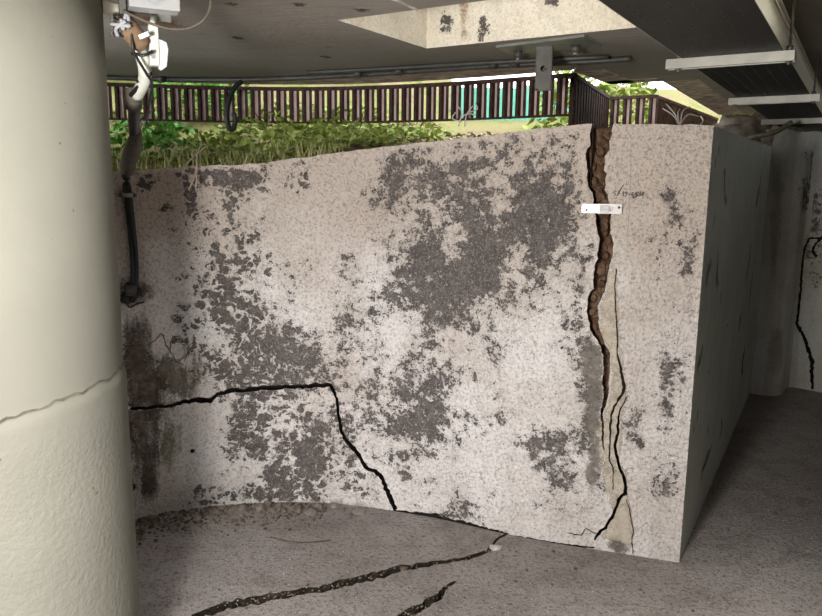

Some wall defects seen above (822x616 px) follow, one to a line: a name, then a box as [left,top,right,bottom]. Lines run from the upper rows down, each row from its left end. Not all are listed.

peeling [134,173,160,194]
peeling [638,174,702,288]
leakage [123,315,203,498]
crack [130,127,634,616]
peeling [158,130,690,545]
leakage [580,336,604,484]
crack [795,236,822,389]